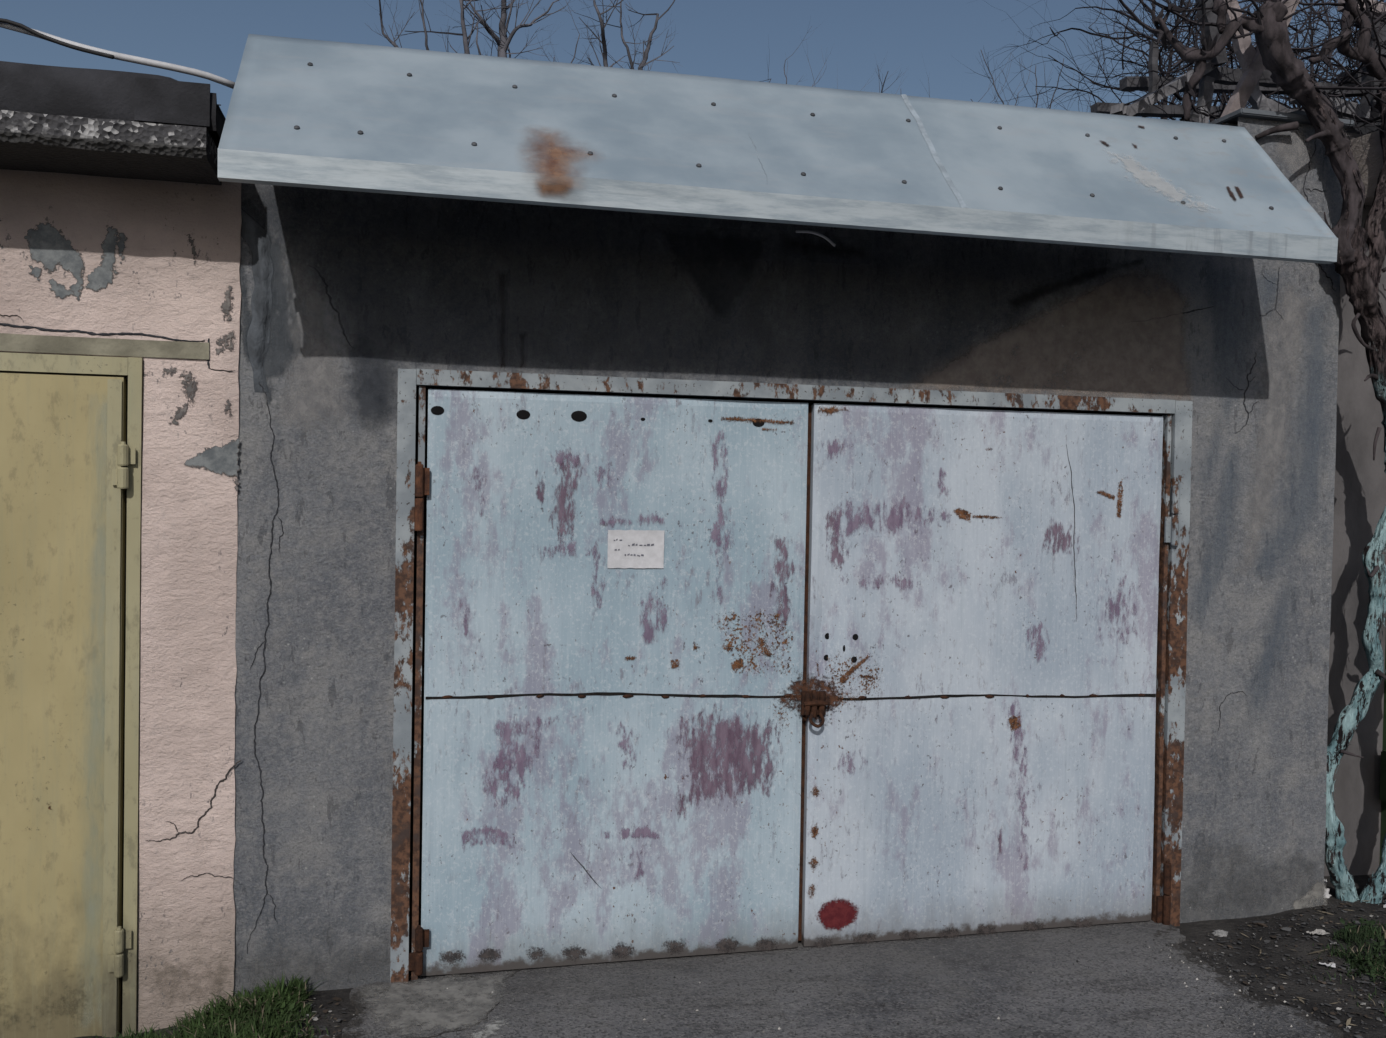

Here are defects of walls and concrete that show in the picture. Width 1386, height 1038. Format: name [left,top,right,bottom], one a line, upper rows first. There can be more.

corrosion [538,136,574,194]
peeling [24,221,128,301]
peeling [216,285,236,355]
leakage [241,192,1106,411]
peeling [162,367,198,426]
peeling [184,438,240,498]
crack [0,314,284,954]
corrosion [714,606,883,730]
peeling [676,704,779,815]